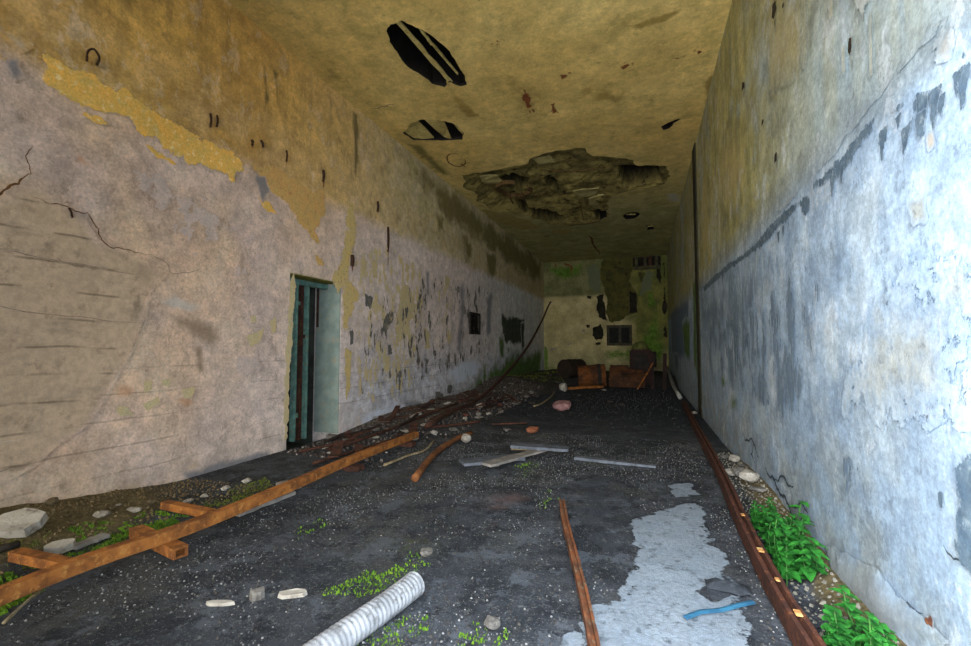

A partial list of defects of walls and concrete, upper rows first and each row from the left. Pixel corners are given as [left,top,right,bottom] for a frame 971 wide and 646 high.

crack [0,148,32,195]
spalling [462,148,670,227]
crack [0,198,208,275]
peeling [39,50,493,411]
spalling [841,248,971,434]
spalling [179,448,272,479]
peeling [953,453,971,574]